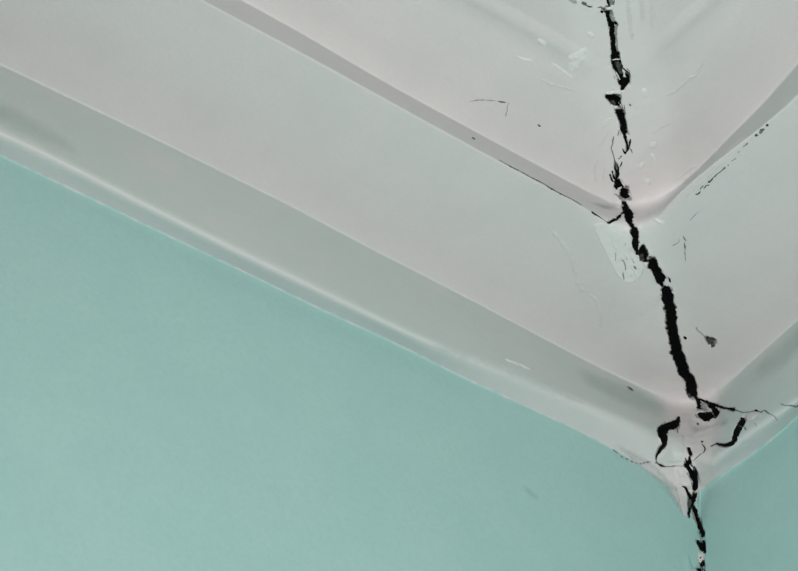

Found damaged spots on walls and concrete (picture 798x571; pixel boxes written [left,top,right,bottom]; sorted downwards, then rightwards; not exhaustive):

peeling [593,215,645,286]
crack [500,0,798,571]